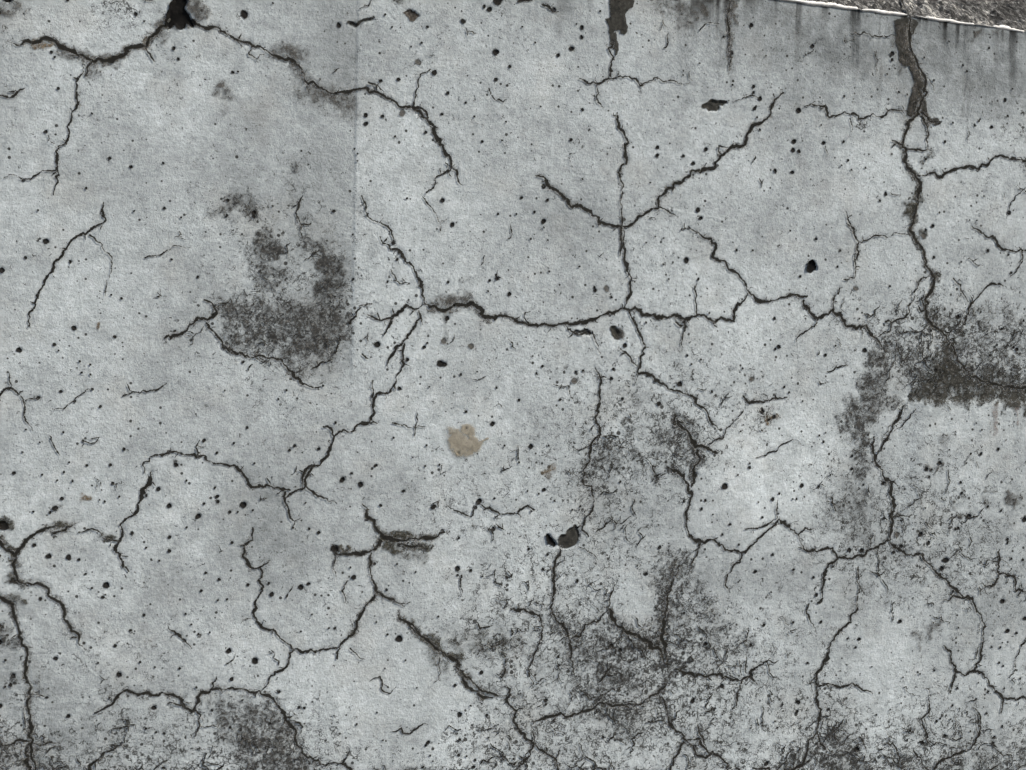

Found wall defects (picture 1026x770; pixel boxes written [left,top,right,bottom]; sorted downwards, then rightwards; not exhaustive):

crack [4,0,462,231]
water stain [606,0,635,56]
water stain [660,0,738,69]
water stain [891,17,942,127]
crack [27,202,113,327]
mould [209,188,352,378]
water stain [819,269,1026,542]
crack [0,522,87,650]
crack [0,596,136,770]
water stain [210,688,313,770]
crack [93,504,791,770]
crack [667,404,1026,770]